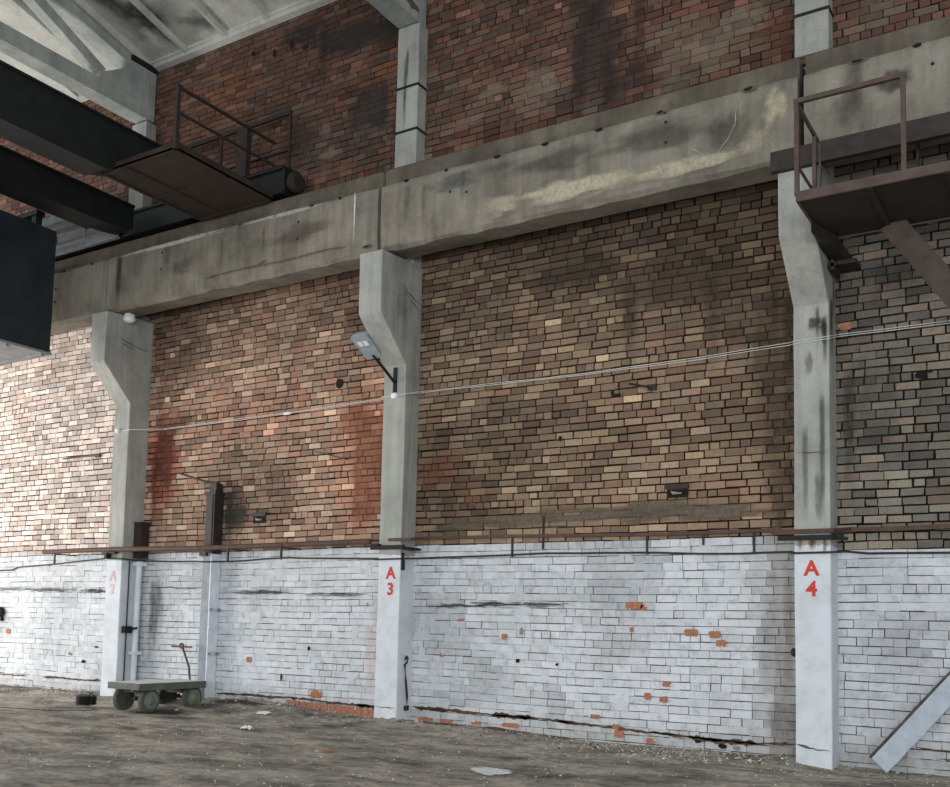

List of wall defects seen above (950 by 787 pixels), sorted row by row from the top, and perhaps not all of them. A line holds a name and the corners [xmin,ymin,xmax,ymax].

damp [809,311,826,347]
peeling [625,602,647,610]
peeling [684,628,726,647]
peeling [644,682,672,703]
peeling [286,690,452,723]
crack [216,693,831,752]
peeling [612,723,624,738]